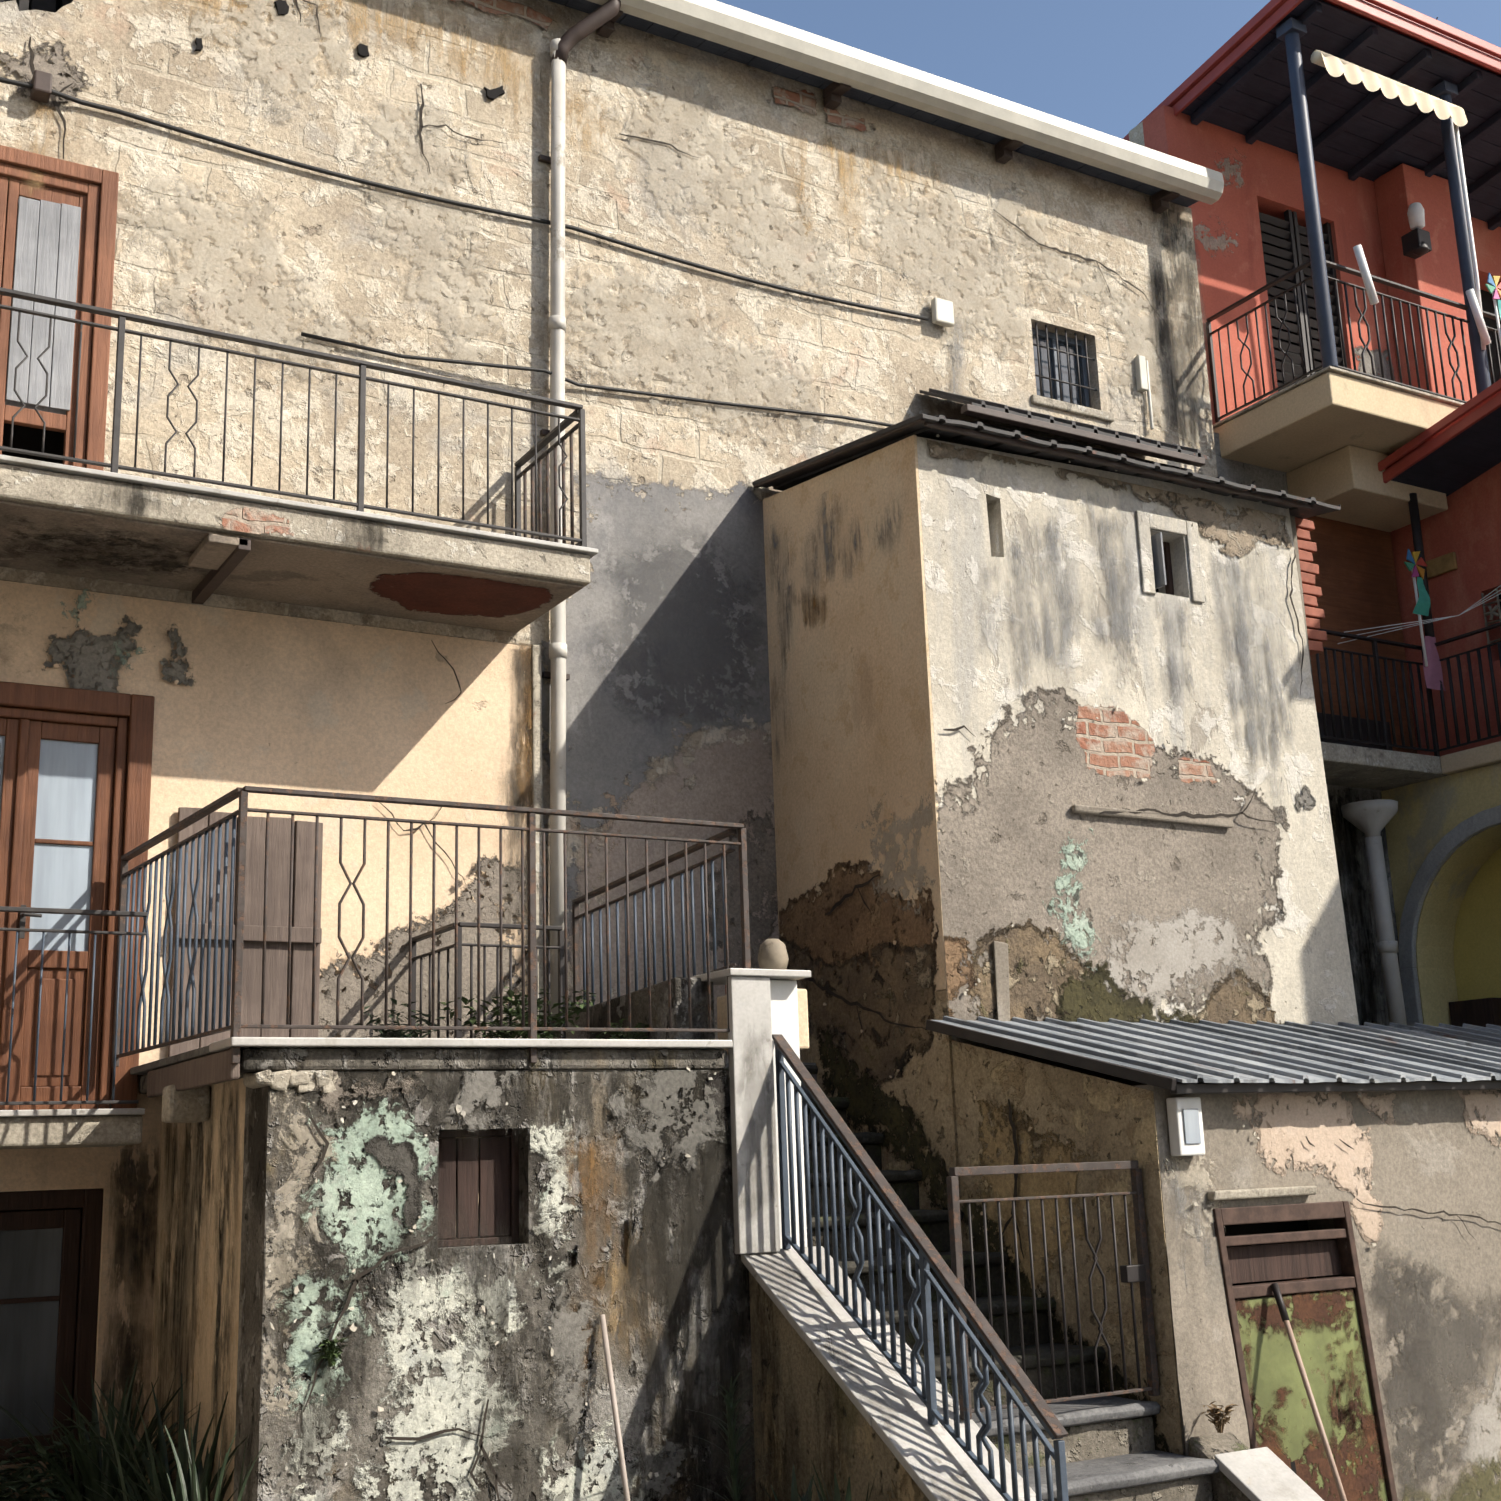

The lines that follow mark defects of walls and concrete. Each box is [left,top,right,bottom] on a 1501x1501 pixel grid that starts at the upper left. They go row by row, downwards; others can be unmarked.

flaking render [1076,704,1170,782]
flaking render [1178,751,1217,784]